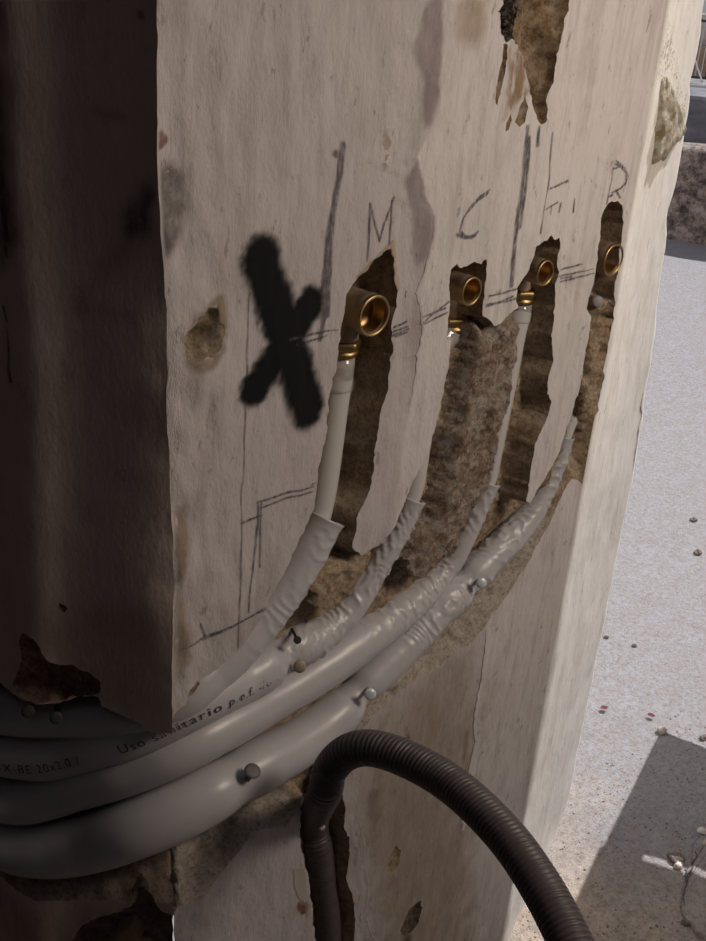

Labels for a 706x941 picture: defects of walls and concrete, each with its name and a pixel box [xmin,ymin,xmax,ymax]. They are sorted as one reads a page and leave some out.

flaking render [495,0,569,131]
spalling [184,296,227,369]
flaking render [391,311,520,578]
flaking render [13,633,101,703]
spalling [353,514,554,785]
spalling [0,782,294,941]